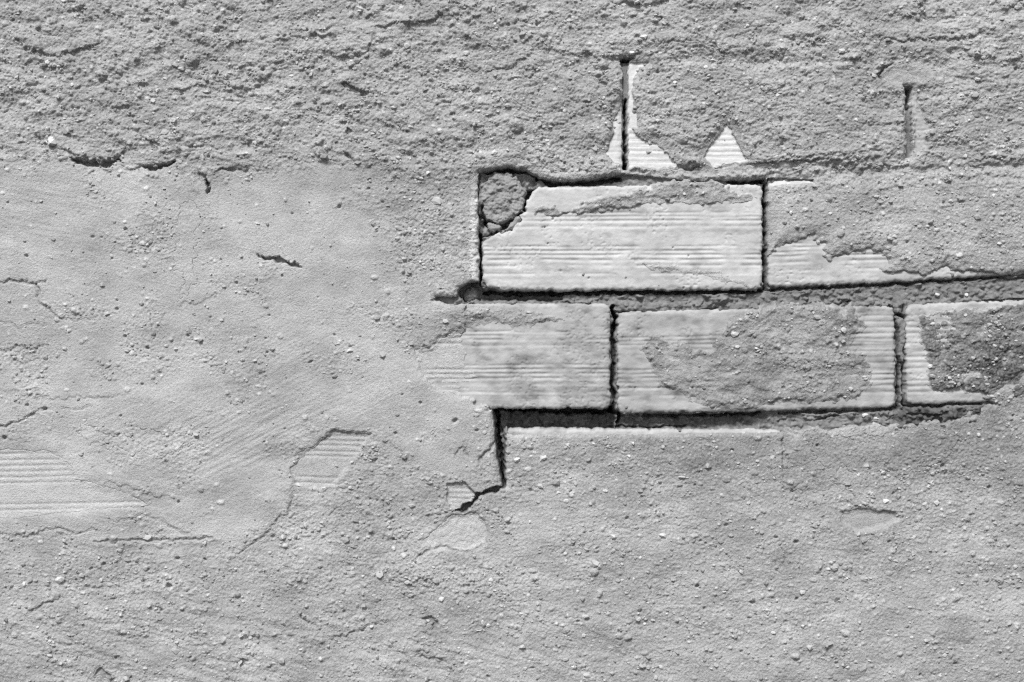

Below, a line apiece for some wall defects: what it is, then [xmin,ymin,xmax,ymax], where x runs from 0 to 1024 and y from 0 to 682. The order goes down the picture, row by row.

spalling [467,63,677,282]
spalling [704,125,748,168]
spalling [877,62,943,157]
spalling [415,333,477,396]
crack [452,408,508,513]